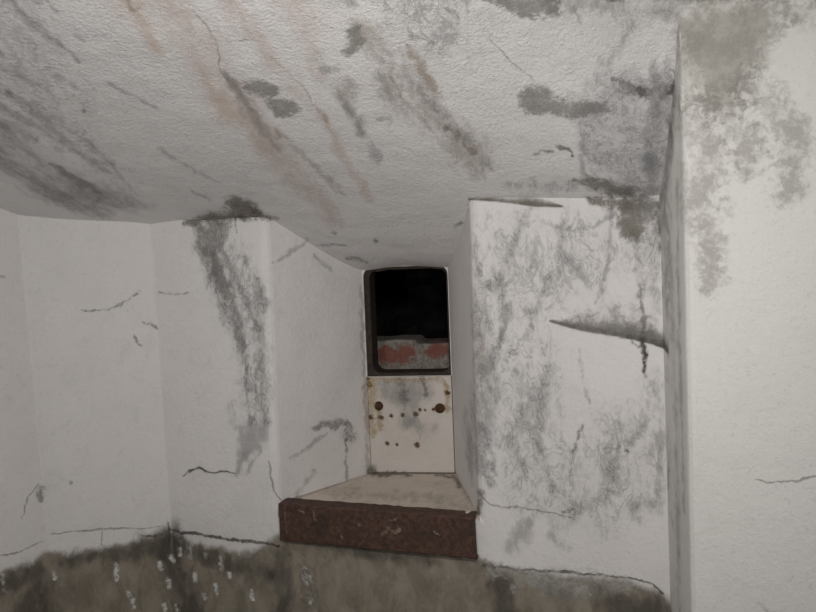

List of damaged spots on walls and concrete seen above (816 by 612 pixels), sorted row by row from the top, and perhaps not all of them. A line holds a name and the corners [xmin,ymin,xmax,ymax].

water stain [585,69,674,253]
crack [183,466,235,476]
crack [147,527,280,547]